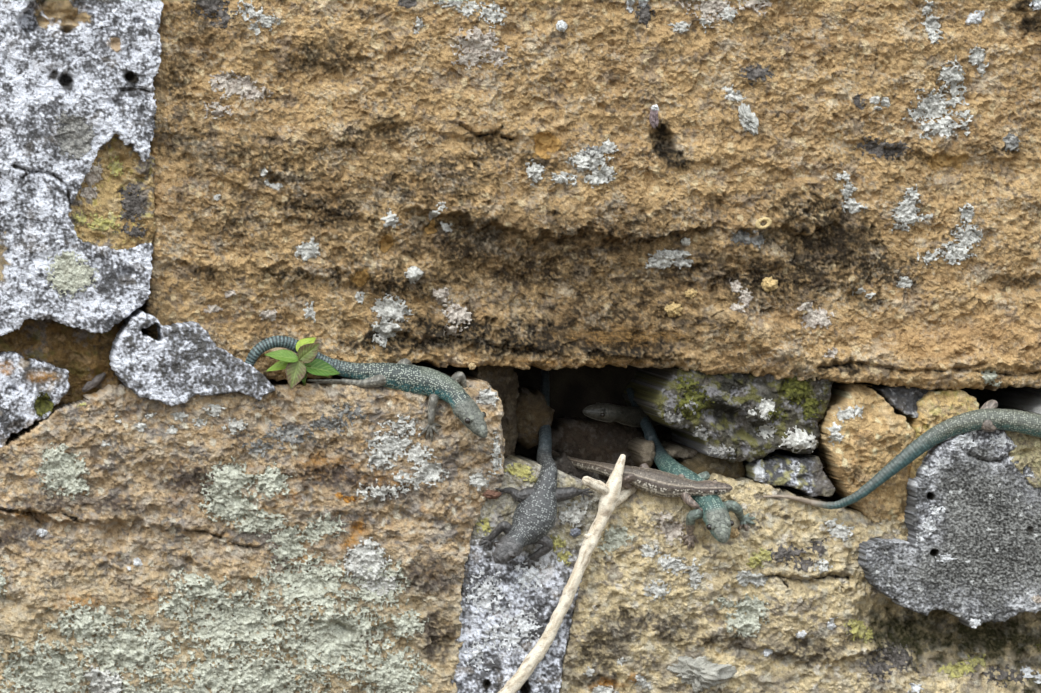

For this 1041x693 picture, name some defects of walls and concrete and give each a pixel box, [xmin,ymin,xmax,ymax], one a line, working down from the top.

crack [0,508,82,523]